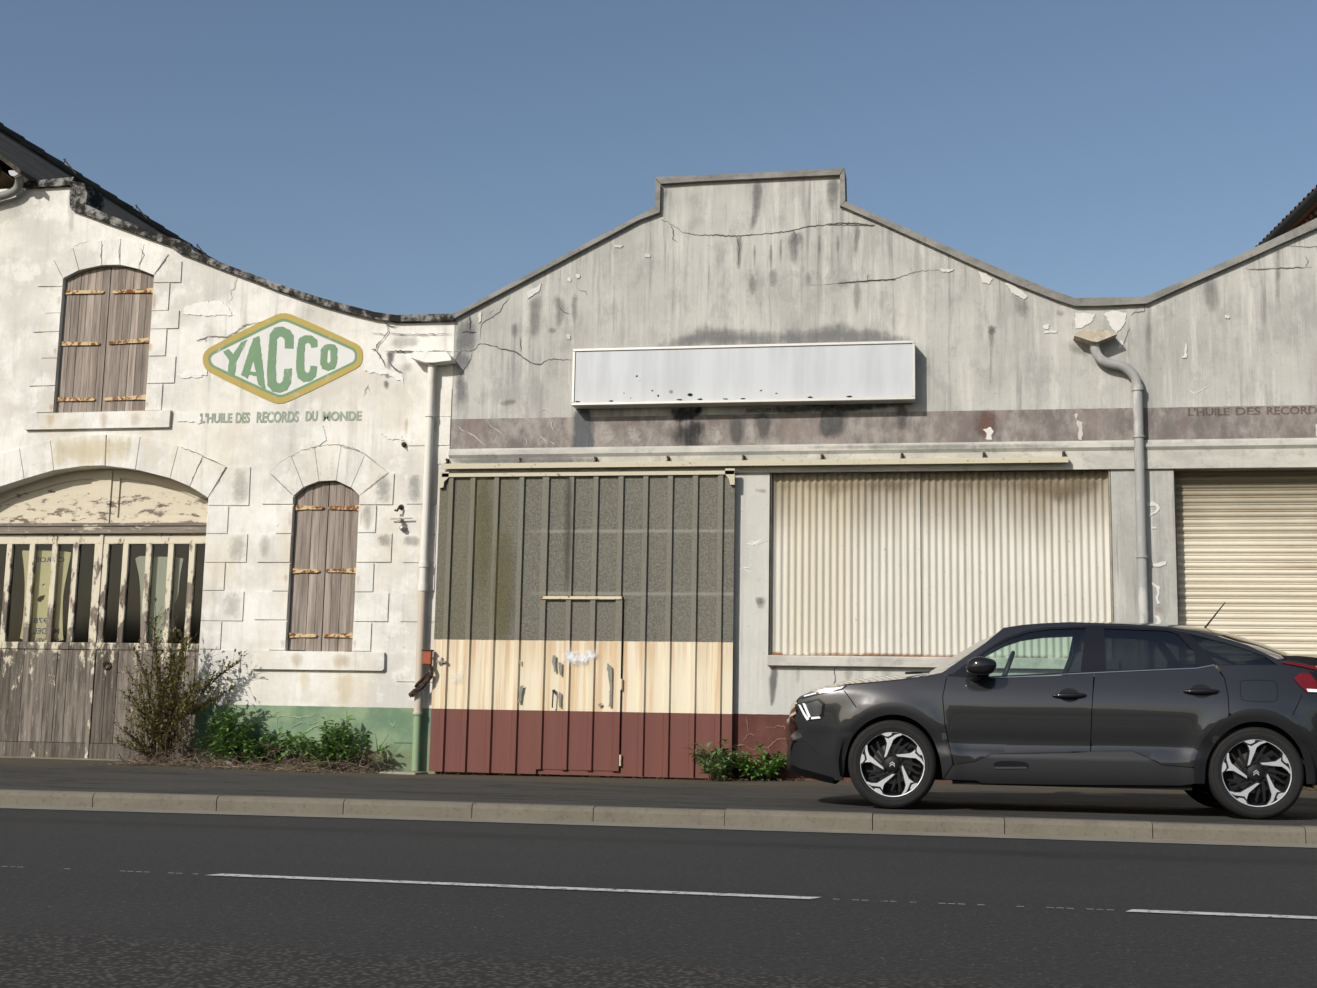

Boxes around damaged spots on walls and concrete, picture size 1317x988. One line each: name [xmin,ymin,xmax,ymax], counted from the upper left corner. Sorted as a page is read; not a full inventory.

crack [661,219,875,259]
crack [1246,245,1317,270]
crack [815,270,933,286]
damp [457,322,473,399]
crack [364,295,568,395]
damp [680,326,895,345]
peeling [1074,310,1127,349]
damp [454,409,593,462]
damp [671,407,701,446]
damp [731,403,911,441]
peeling [598,663,612,707]